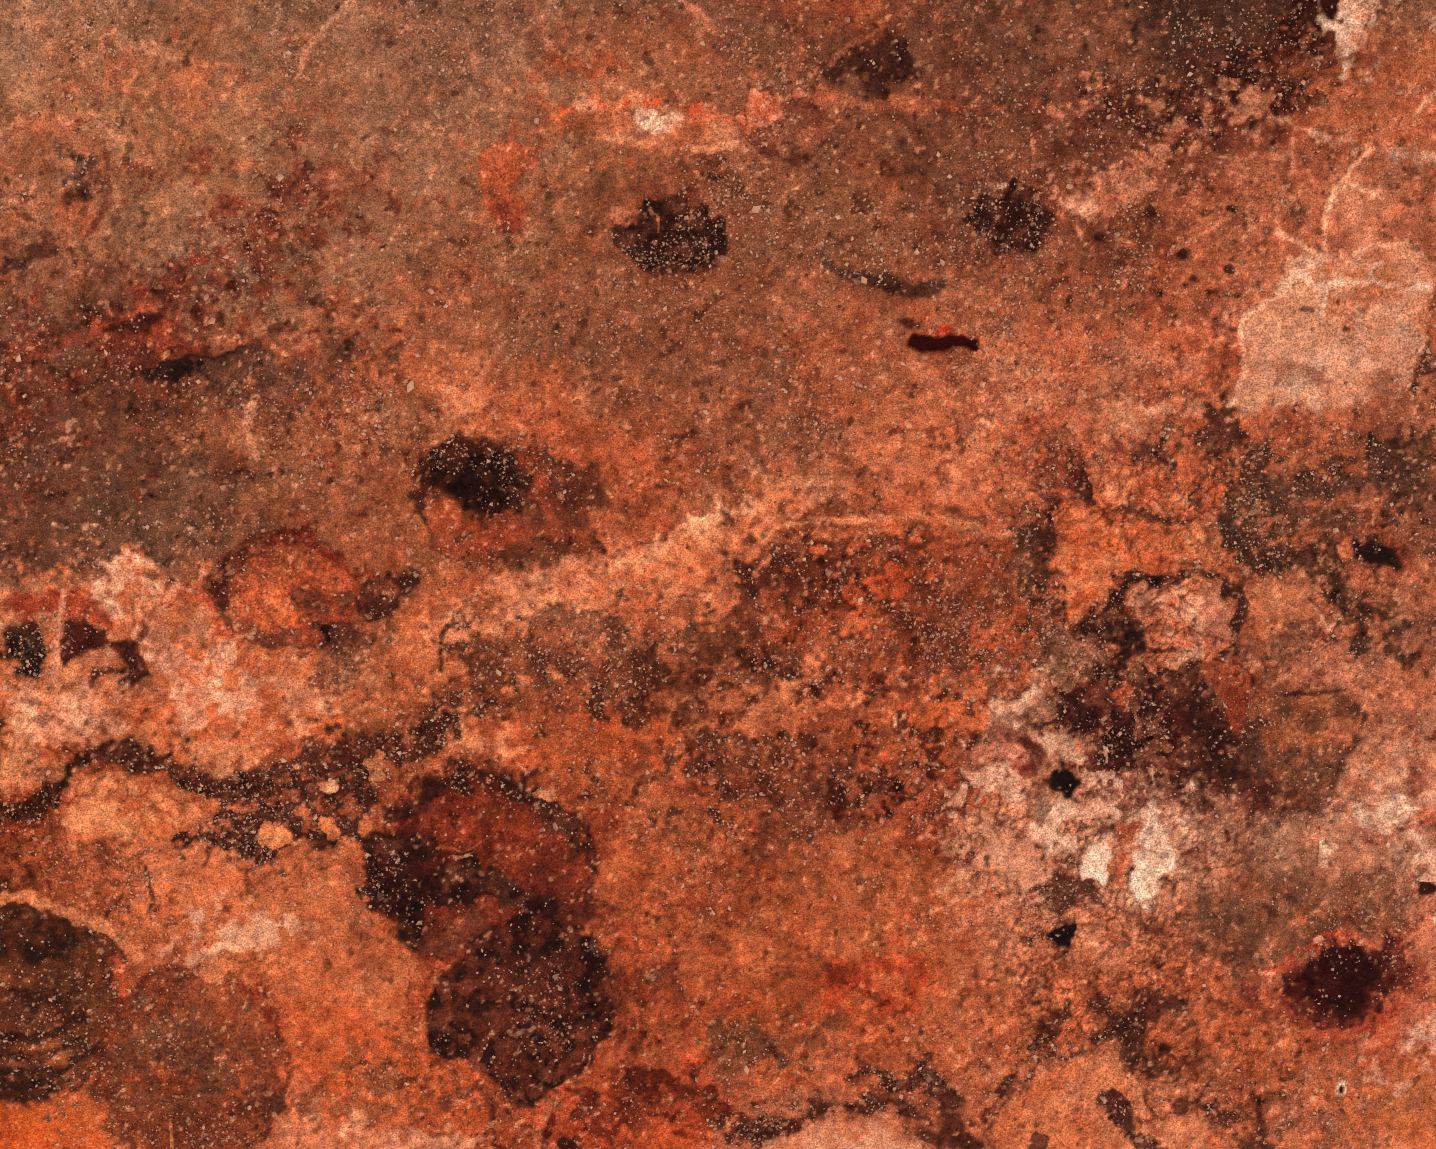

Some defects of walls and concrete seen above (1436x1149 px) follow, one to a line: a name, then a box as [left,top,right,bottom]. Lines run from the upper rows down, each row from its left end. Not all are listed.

corrosion [459,1,740,251]
corrosion [712,0,941,49]
efflorescence [1220,160,1436,445]
corrosion [0,562,181,780]
corrosion [168,504,387,707]
corrosion [335,740,657,972]
leakage [936,655,1423,994]
corrosion [1231,901,1436,1057]